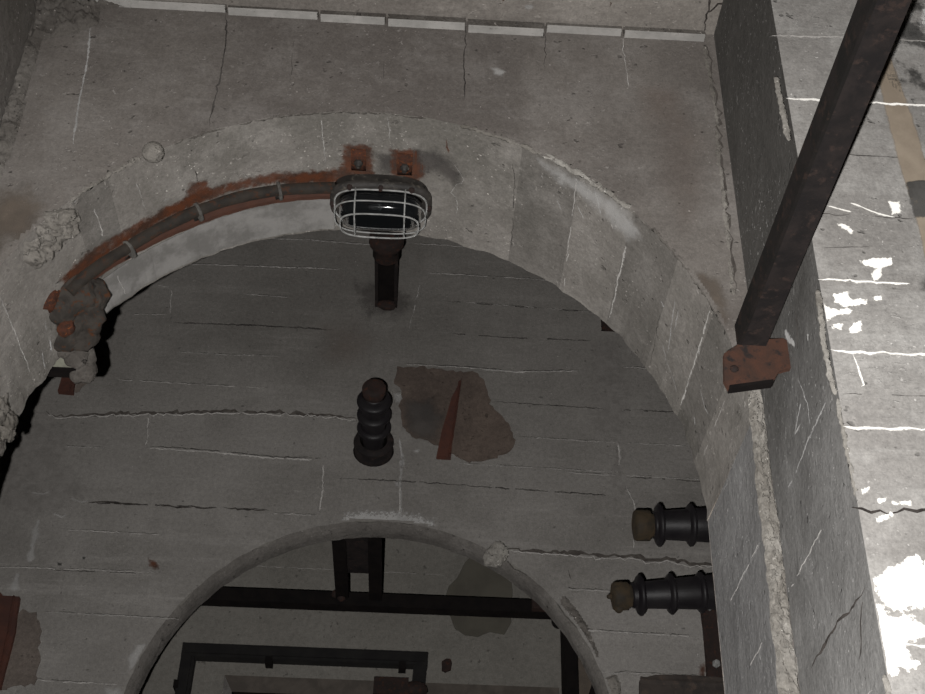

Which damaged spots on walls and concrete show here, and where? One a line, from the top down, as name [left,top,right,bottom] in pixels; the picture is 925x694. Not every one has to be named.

rust [63,145,375,283]
crack [703,0,737,296]
crack [851,506,925,514]